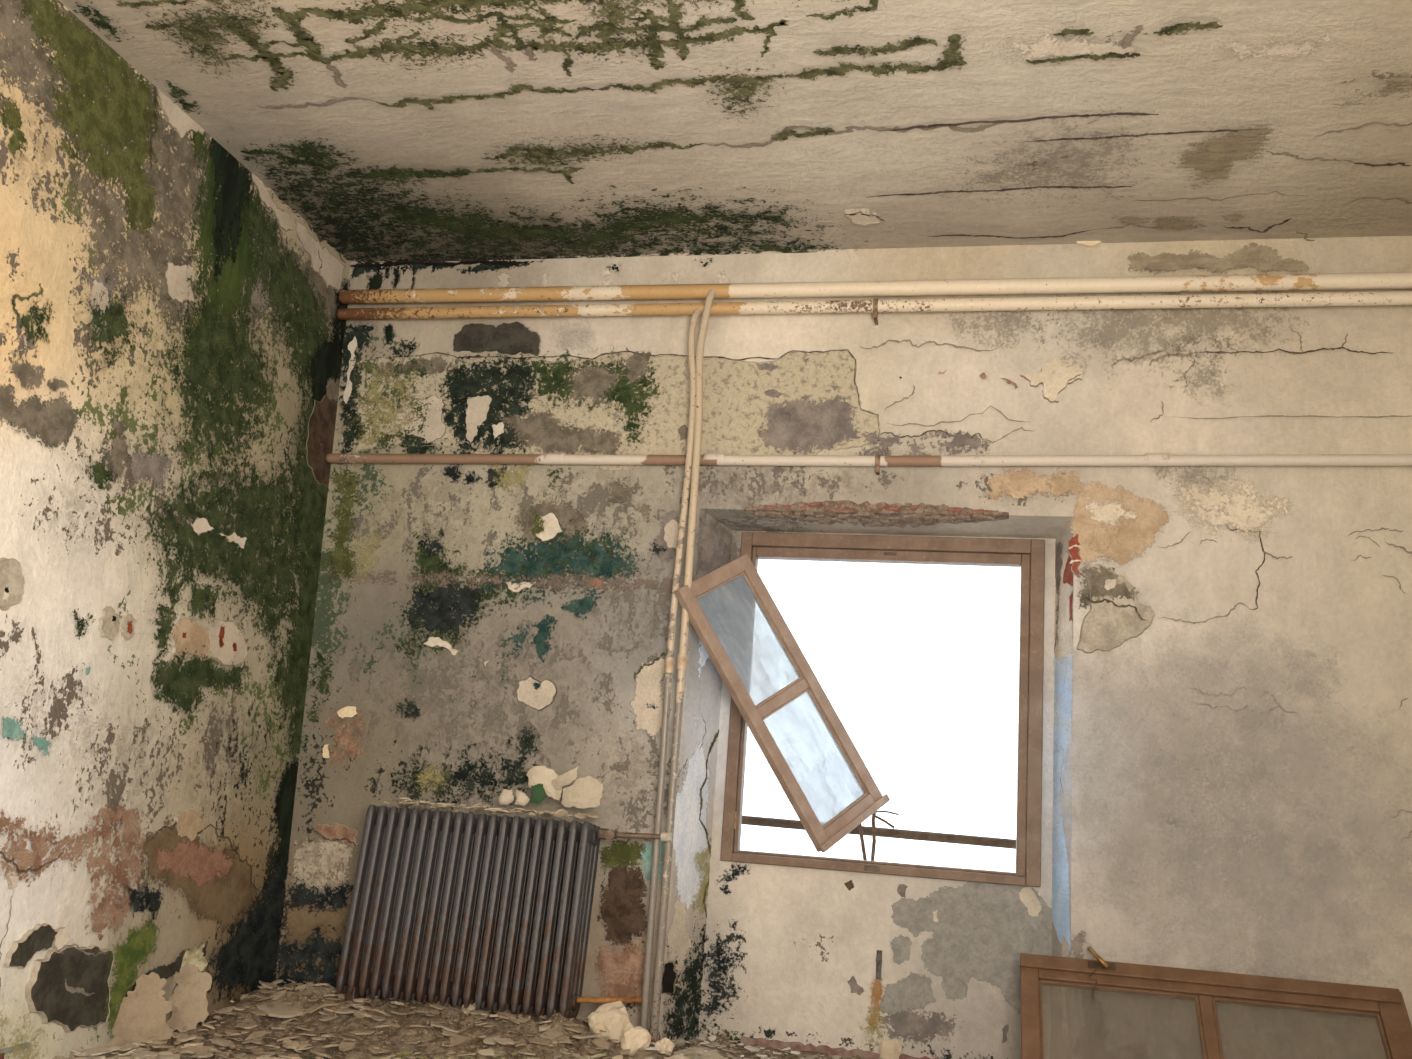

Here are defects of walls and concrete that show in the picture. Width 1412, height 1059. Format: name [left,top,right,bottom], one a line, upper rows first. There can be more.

crack [71,0,1412,270]
water stain [18,298,56,353]
peeling [0,335,80,451]
peeling [303,320,1004,563]
crack [1149,328,1409,422]
water stain [70,608,96,640]
water stain [75,134,868,1047]
flaking render [744,466,1170,660]
crack [1161,477,1293,624]
crack [1347,527,1412,594]
flaking render [0,798,259,1033]
flaking render [879,881,1052,1046]